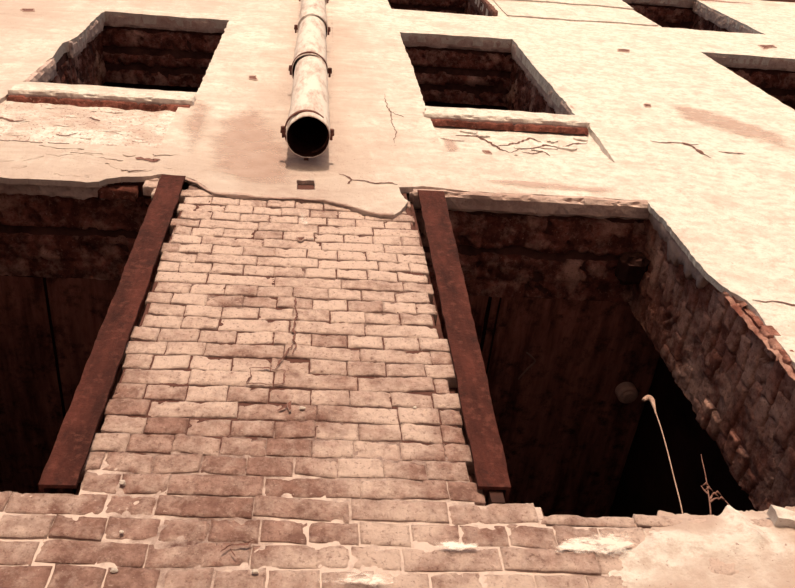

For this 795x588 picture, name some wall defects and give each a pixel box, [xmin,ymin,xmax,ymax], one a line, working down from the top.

peeling [46,105,81,127]
crack [442,129,588,156]
crack [654,141,743,158]
peeling [0,129,181,202]
crack [340,174,398,185]
spalling [78,177,486,506]
spalling [628,213,795,511]